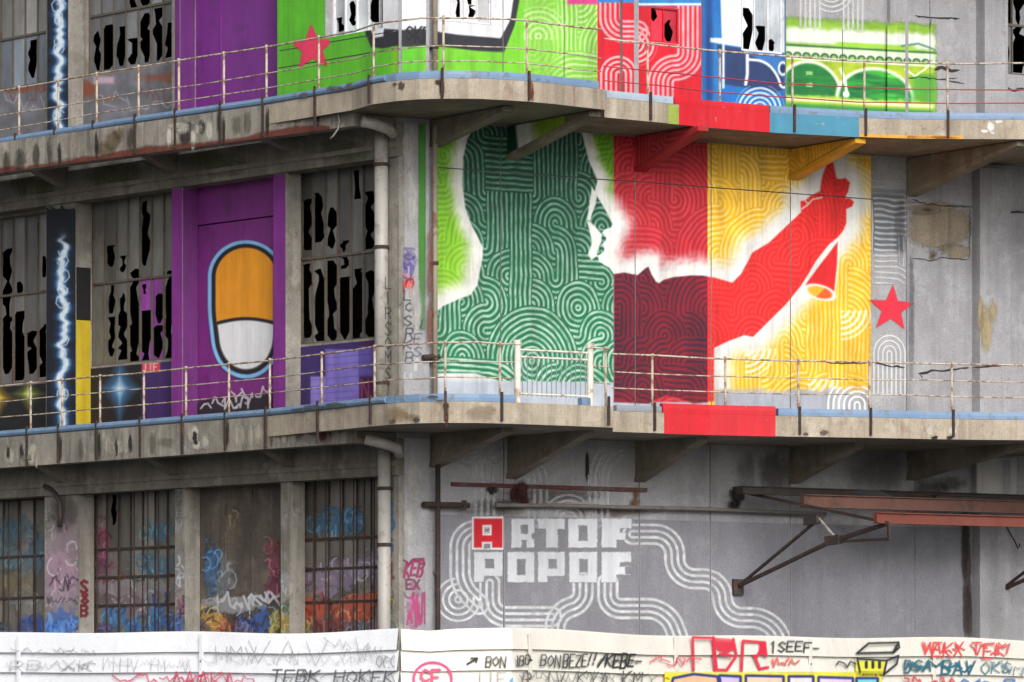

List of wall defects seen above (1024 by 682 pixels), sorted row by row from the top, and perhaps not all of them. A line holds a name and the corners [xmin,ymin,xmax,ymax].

crack [915,15,960,26]
corrosion [0,126,330,173]
leakage [979,297,995,349]
crack [827,362,998,378]
corrosion [511,480,530,503]
leakage [961,526,972,636]